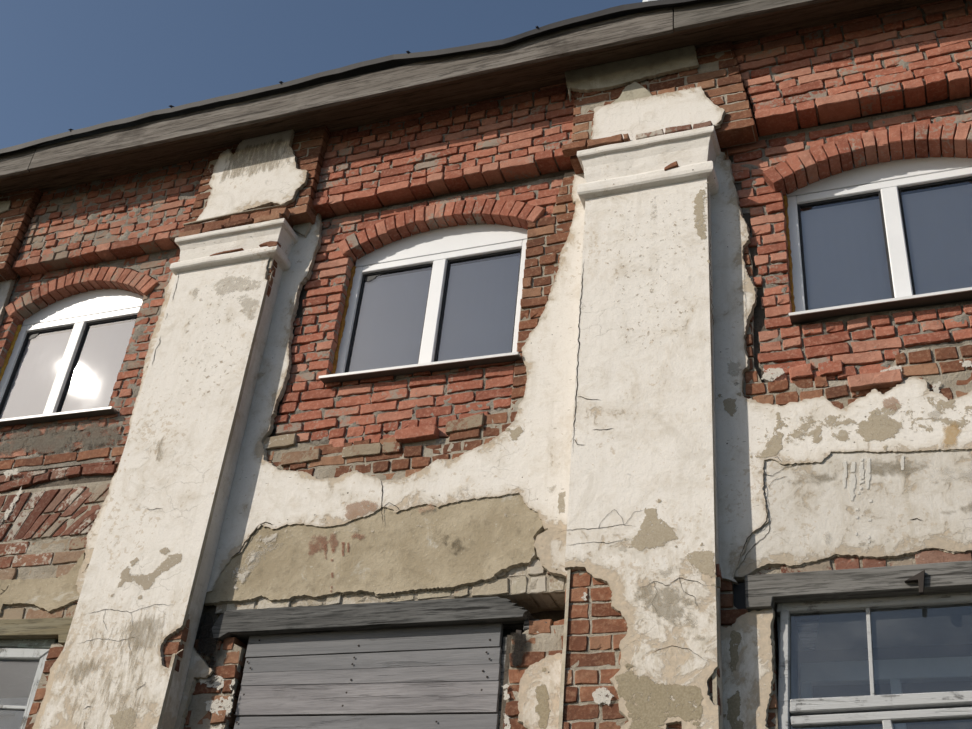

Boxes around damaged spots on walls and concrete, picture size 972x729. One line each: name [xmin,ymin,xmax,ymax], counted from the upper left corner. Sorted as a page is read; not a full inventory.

flaking render [0,187,43,325]
flaking render [177,41,972,489]
flaking render [0,601,78,620]
flaking render [0,480,111,580]
crack [78,604,165,648]
peeling [111,547,182,599]
flaking render [161,614,247,729]
flaking render [215,529,972,729]
crack [561,509,642,545]
peeling [624,499,678,551]
crack [640,577,701,614]
crack [738,457,795,565]